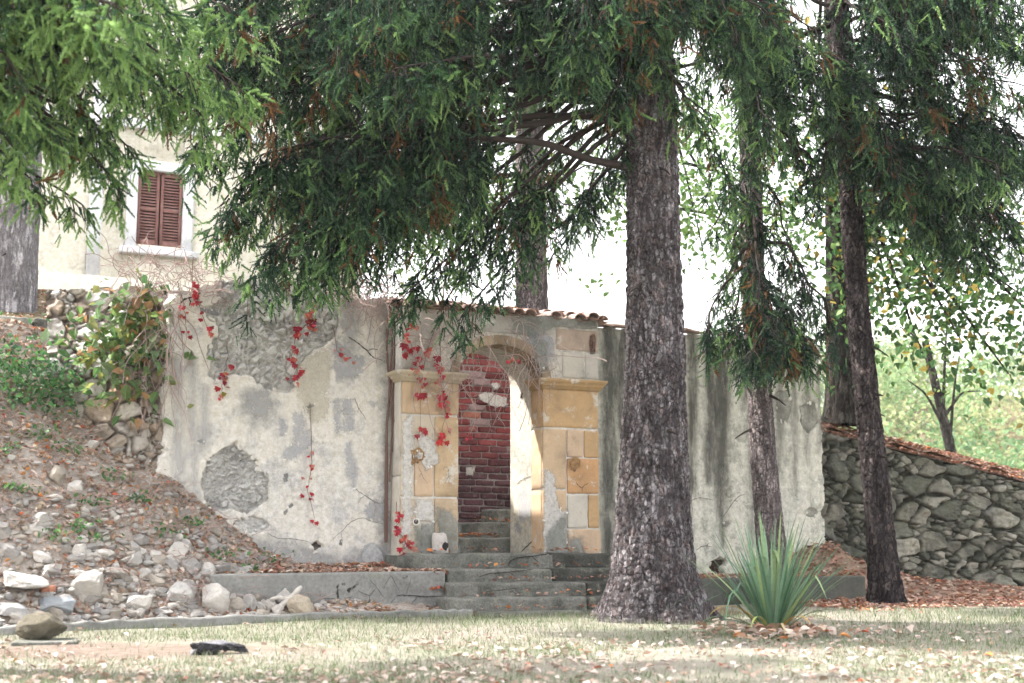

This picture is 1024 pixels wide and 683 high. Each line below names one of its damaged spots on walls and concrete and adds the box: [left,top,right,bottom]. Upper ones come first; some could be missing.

flaking render [201,443,269,534]
flaking render [201,280,364,491]
peeling [401,415,438,549]
water stain [688,333,729,543]